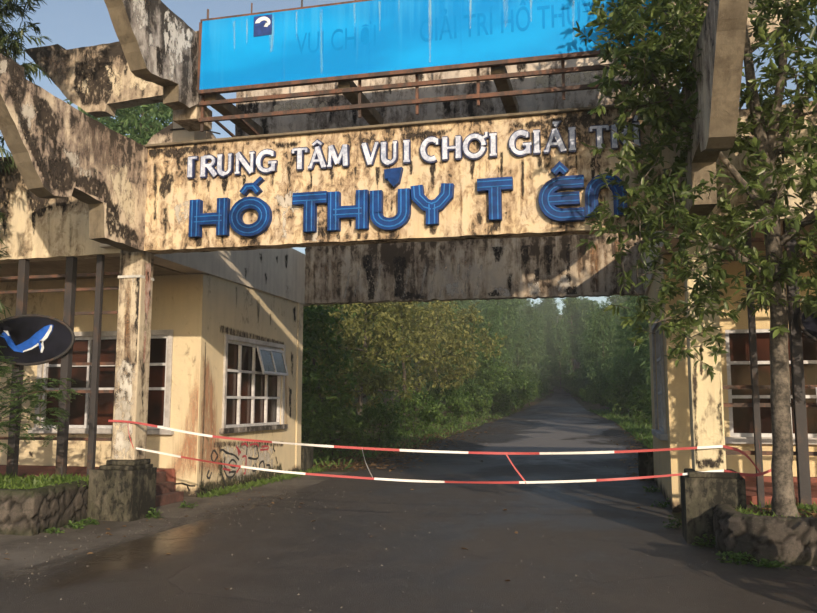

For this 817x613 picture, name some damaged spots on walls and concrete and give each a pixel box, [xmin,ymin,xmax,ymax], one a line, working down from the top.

damp [74,50,127,105]
damp [8,66,138,242]
damp [238,102,298,148]
damp [402,127,454,141]
damp [511,115,589,129]
damp [0,187,11,235]
damp [357,255,382,300]
damp [393,256,436,299]
damp [520,245,553,285]
damp [566,244,577,294]
peeling [114,360,135,459]
rust [174,363,221,473]